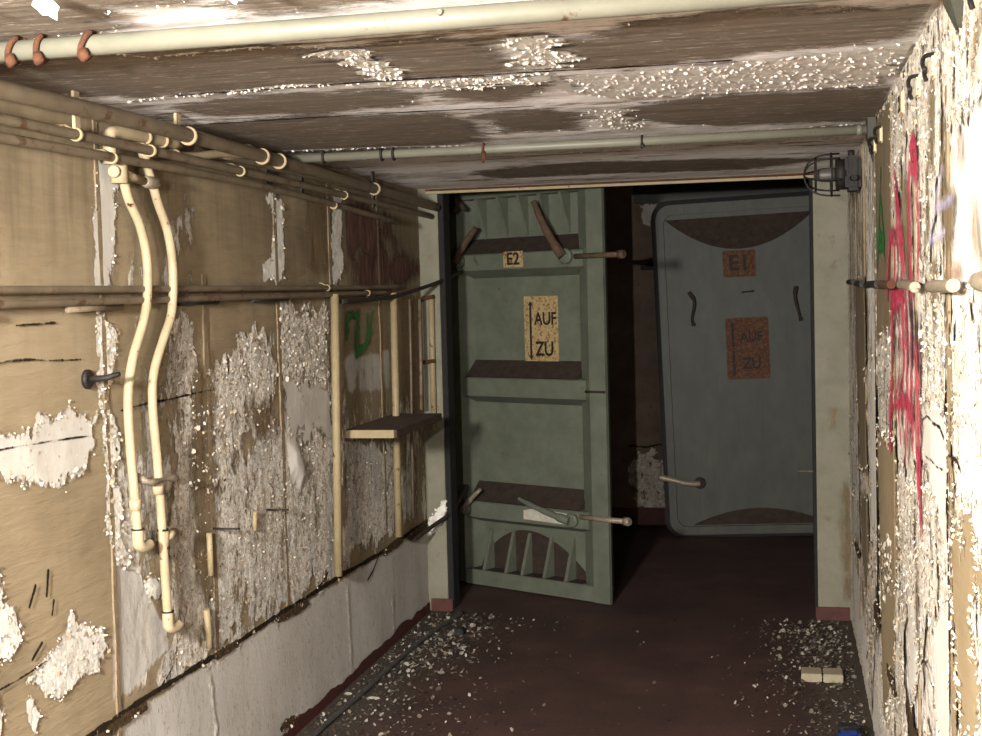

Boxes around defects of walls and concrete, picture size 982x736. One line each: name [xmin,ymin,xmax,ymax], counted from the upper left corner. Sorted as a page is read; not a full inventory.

peeling [942,0,982,139]
peeling [92,160,119,286]
peeling [262,192,286,282]
peeling [330,196,344,292]
peeling [469,158,824,179]
crack [939,186,947,278]
peeling [0,311,134,570]
peeling [155,298,340,692]
peeling [346,438,447,557]
crack [922,415,961,475]
peeling [26,609,111,734]
crack [916,508,950,734]